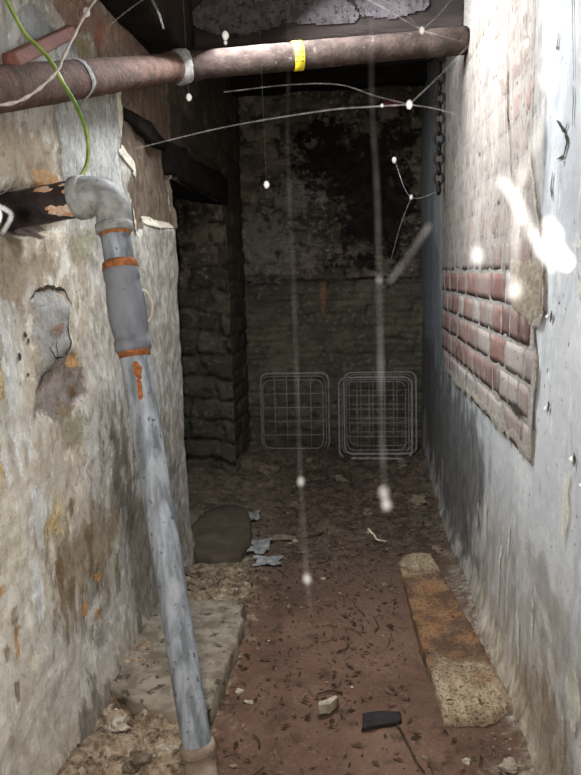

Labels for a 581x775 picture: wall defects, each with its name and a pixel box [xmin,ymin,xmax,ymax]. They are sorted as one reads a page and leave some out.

flaking render [441,0,553,463]
spalling [35,346,87,423]
rust [4,607,20,662]